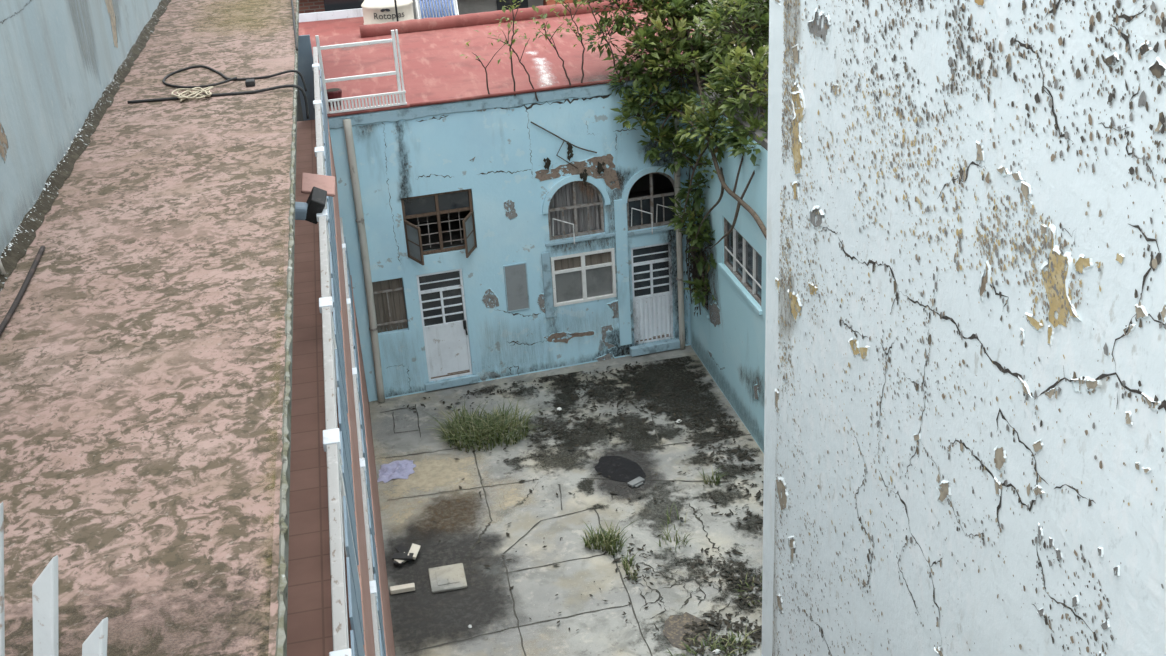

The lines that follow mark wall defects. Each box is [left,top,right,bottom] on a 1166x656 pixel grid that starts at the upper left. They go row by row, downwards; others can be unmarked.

peeling [0,122,9,164]
flaking render [534,153,620,191]
flaking render [481,288,499,309]
water stain [581,307,637,363]
flaking render [708,302,722,328]
peeling [773,0,1166,656]
crack [818,224,1166,650]
water stain [382,457,480,523]